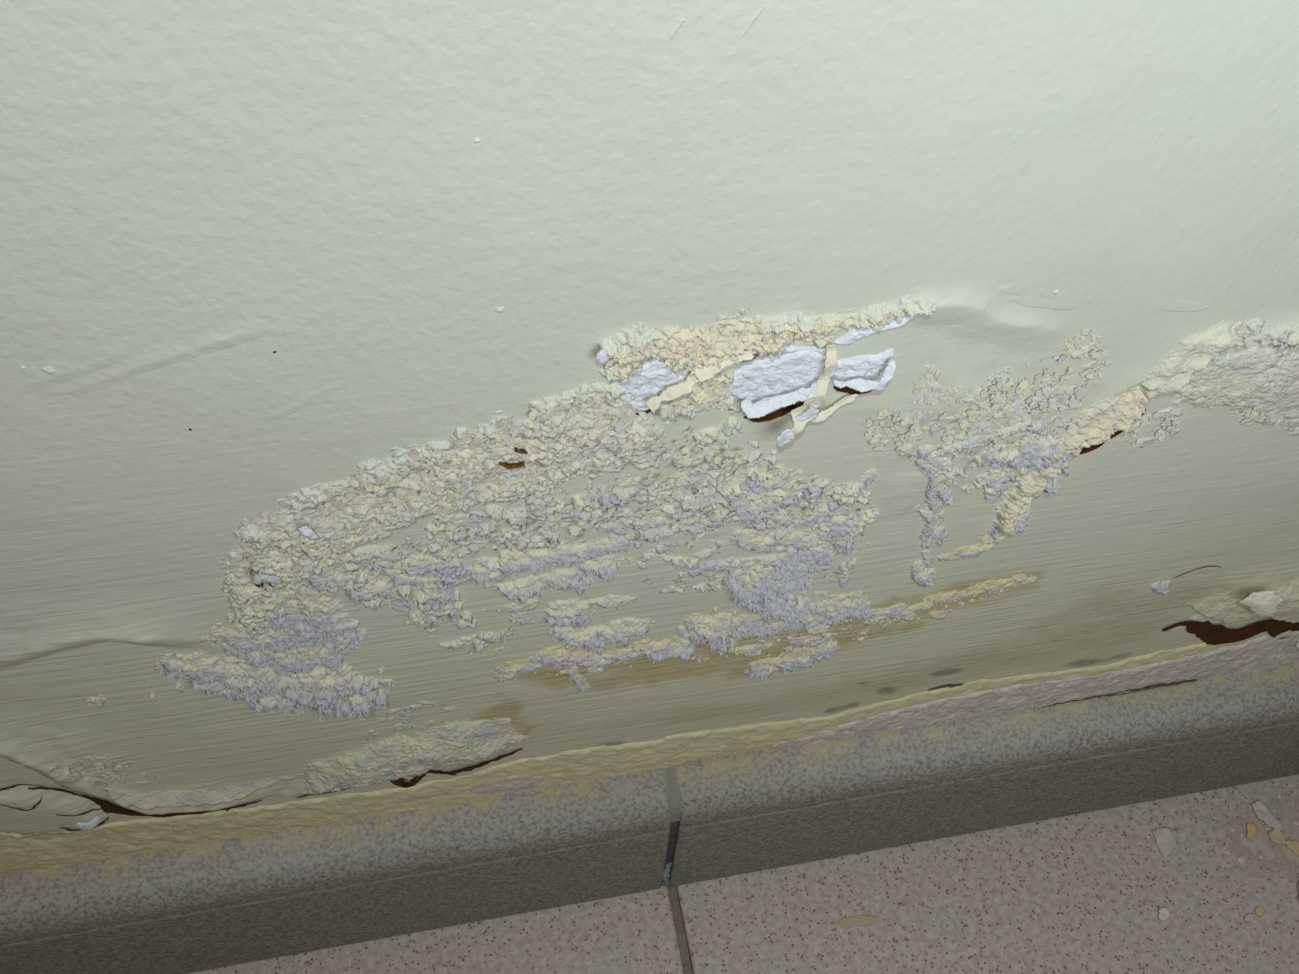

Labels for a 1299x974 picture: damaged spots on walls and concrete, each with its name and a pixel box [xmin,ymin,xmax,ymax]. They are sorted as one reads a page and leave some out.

flaking render [217,295,938,635]
water stain [157,434,1076,722]
flaking render [770,577,1299,749]
flaking render [862,317,1299,536]